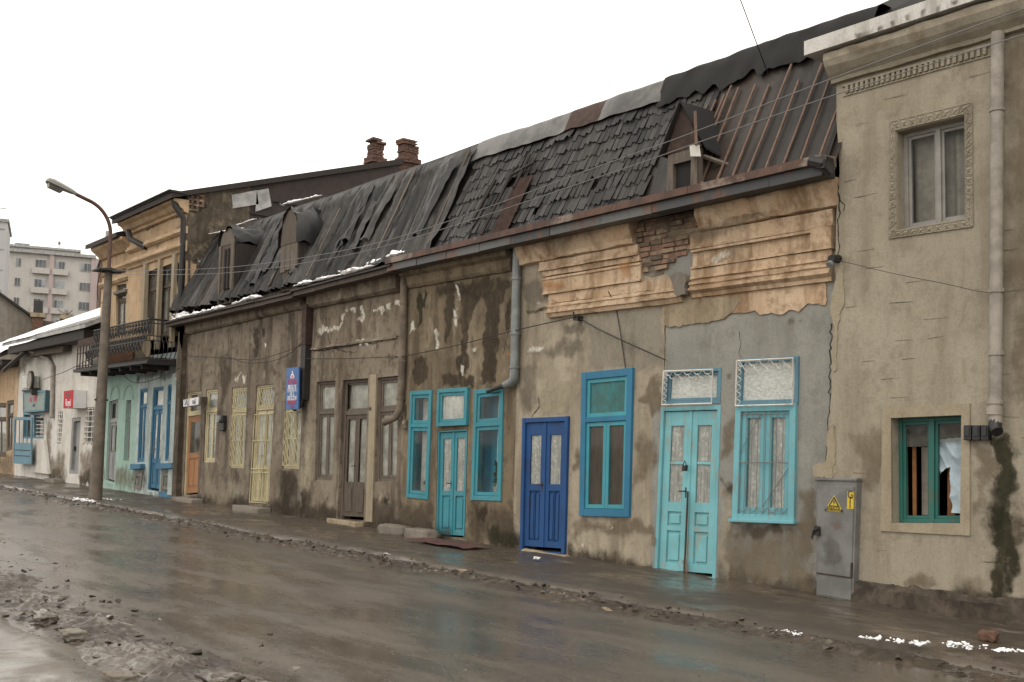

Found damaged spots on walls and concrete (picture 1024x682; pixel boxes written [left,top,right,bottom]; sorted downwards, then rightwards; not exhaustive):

spalling [636,211,699,277]
peeling [318,300,400,335]
water stain [412,356,427,385]
water stain [423,278,550,388]
water stain [529,322,583,357]
spalling [664,294,742,327]
crack [825,306,855,459]
crack [861,280,945,398]
water stain [955,434,1020,598]